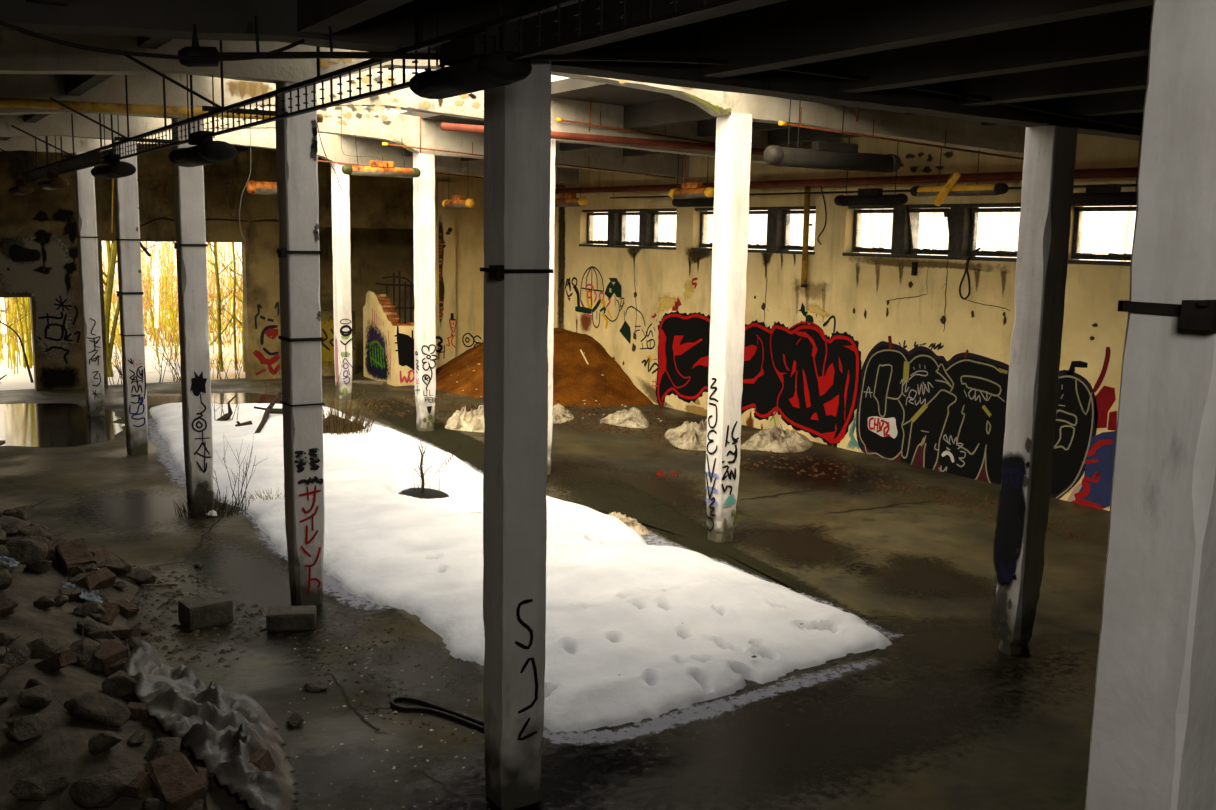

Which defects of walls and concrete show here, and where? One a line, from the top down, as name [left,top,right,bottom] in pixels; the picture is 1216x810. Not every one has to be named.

peeling [320,50,362,68]
peeling [455,93,480,108]
spalling [310,75,431,161]
water stain [686,248,710,276]
water stain [761,253,796,278]
water stain [856,257,1006,293]